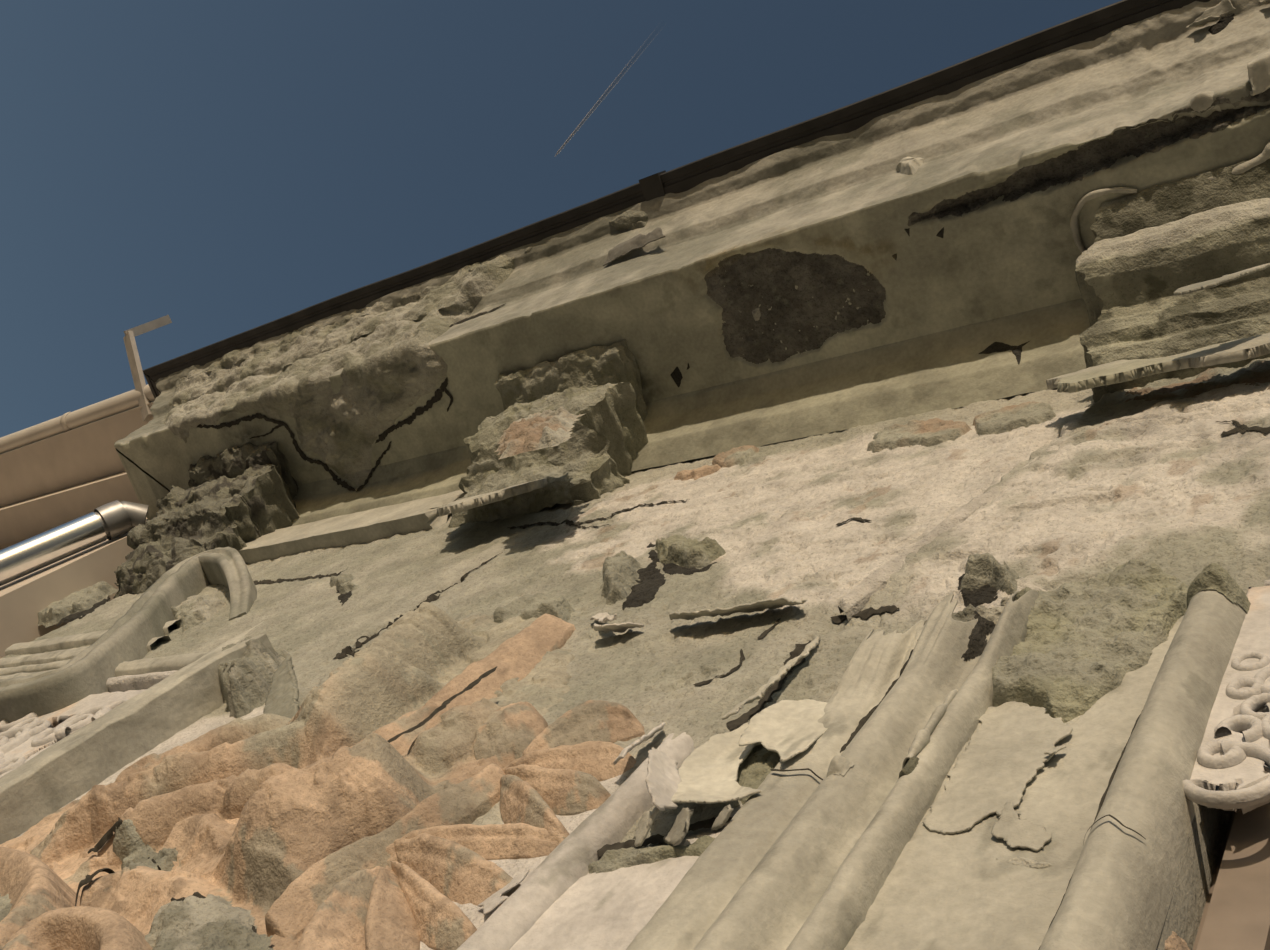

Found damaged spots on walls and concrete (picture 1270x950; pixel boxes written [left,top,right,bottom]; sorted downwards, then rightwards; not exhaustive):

peeling [1186,0,1236,35]
spalling [905,50,1270,253]
spalling [704,248,886,364]
crack [197,378,453,492]
flaking render [494,407,584,459]
crack [333,500,687,659]
peeling [669,597,806,620]
peeling [588,636,828,874]
peeling [899,689,958,778]
spalling [922,552,1251,869]
spalling [144,894,274,950]